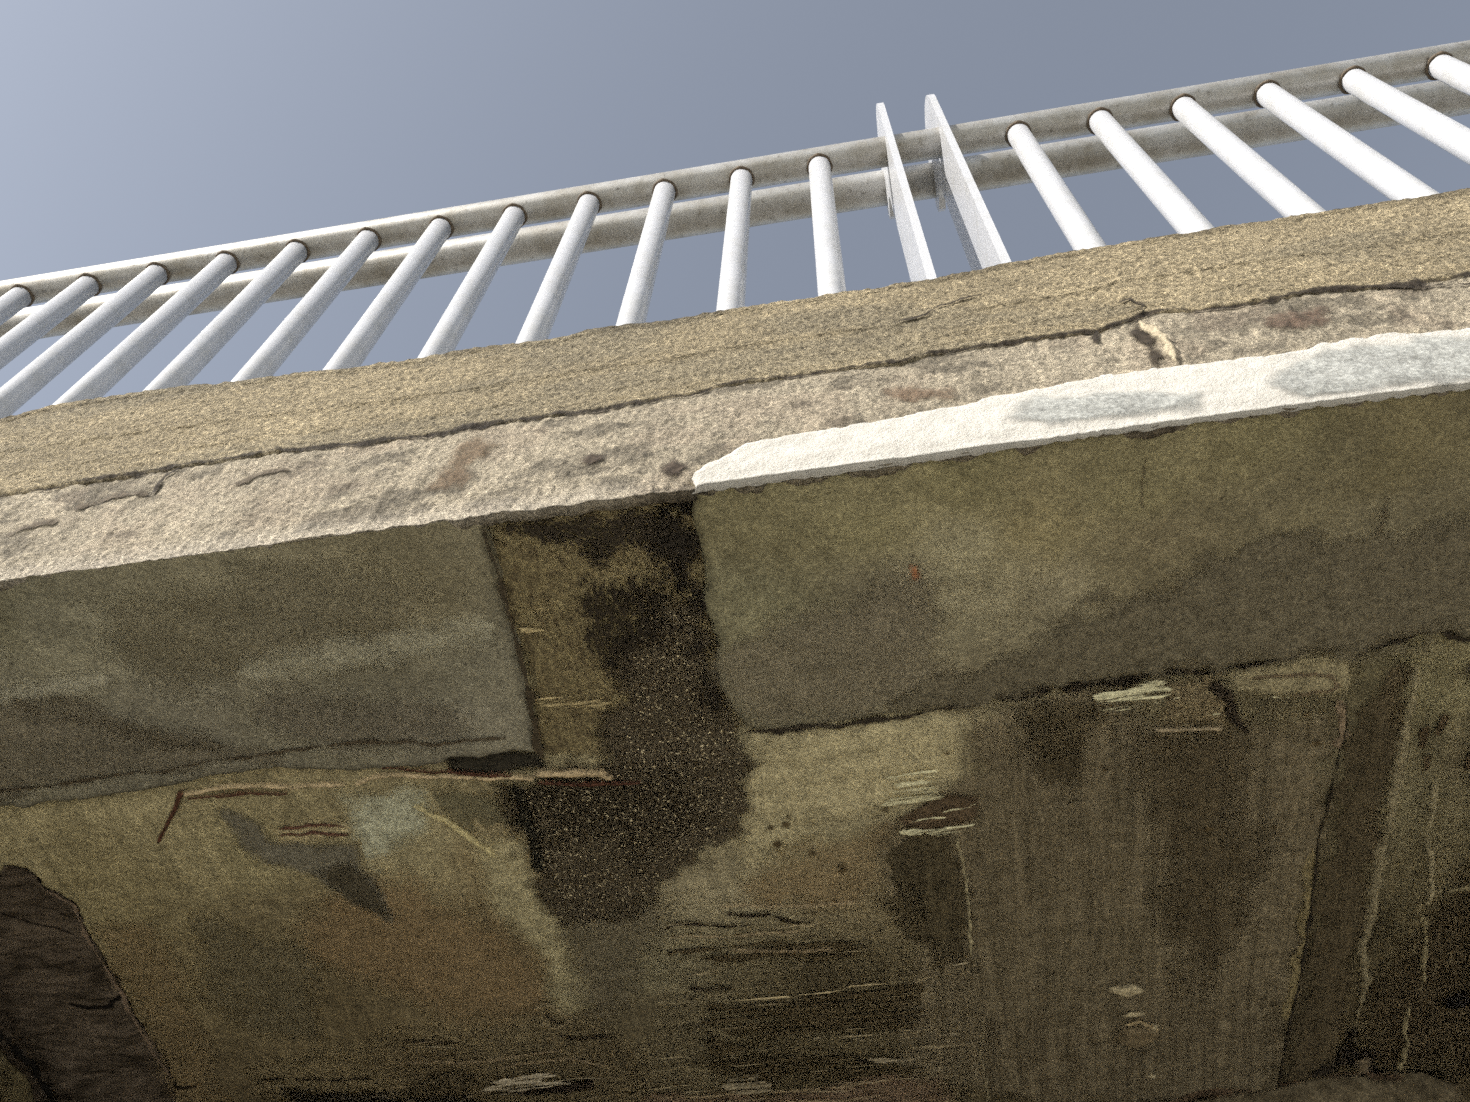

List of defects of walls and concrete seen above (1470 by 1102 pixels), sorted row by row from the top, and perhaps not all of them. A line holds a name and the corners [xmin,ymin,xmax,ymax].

crack [0,271,1470,497]
crack [0,529,543,792]
leakage [221,517,1470,1102]
crack [0,1030,56,1102]
spalling [0,865,197,1102]
leakage [199,923,311,1035]